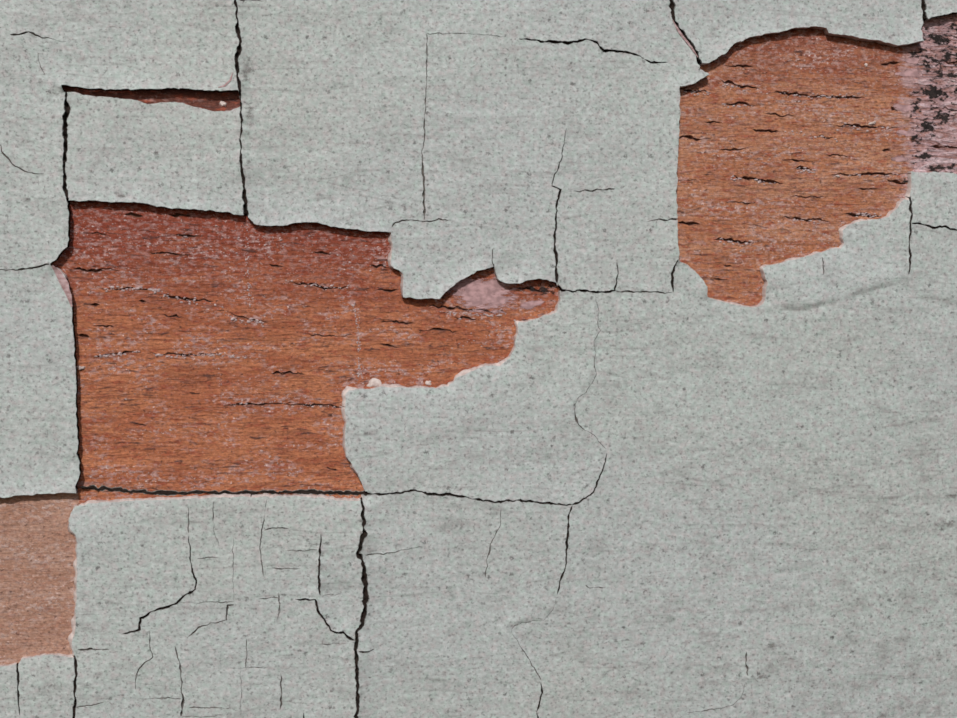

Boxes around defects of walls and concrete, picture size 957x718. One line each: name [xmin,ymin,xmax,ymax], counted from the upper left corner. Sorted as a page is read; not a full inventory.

crack [669,0,702,64]
crack [920,0,928,29]
crack [0,145,38,174]
crack [392,33,667,227]
peeling [672,14,957,308]
mould [909,15,957,173]
crack [0,263,49,271]
crack [908,196,957,273]
peeling [0,72,560,667]
crack [72,131,678,718]
crack [14,663,22,715]